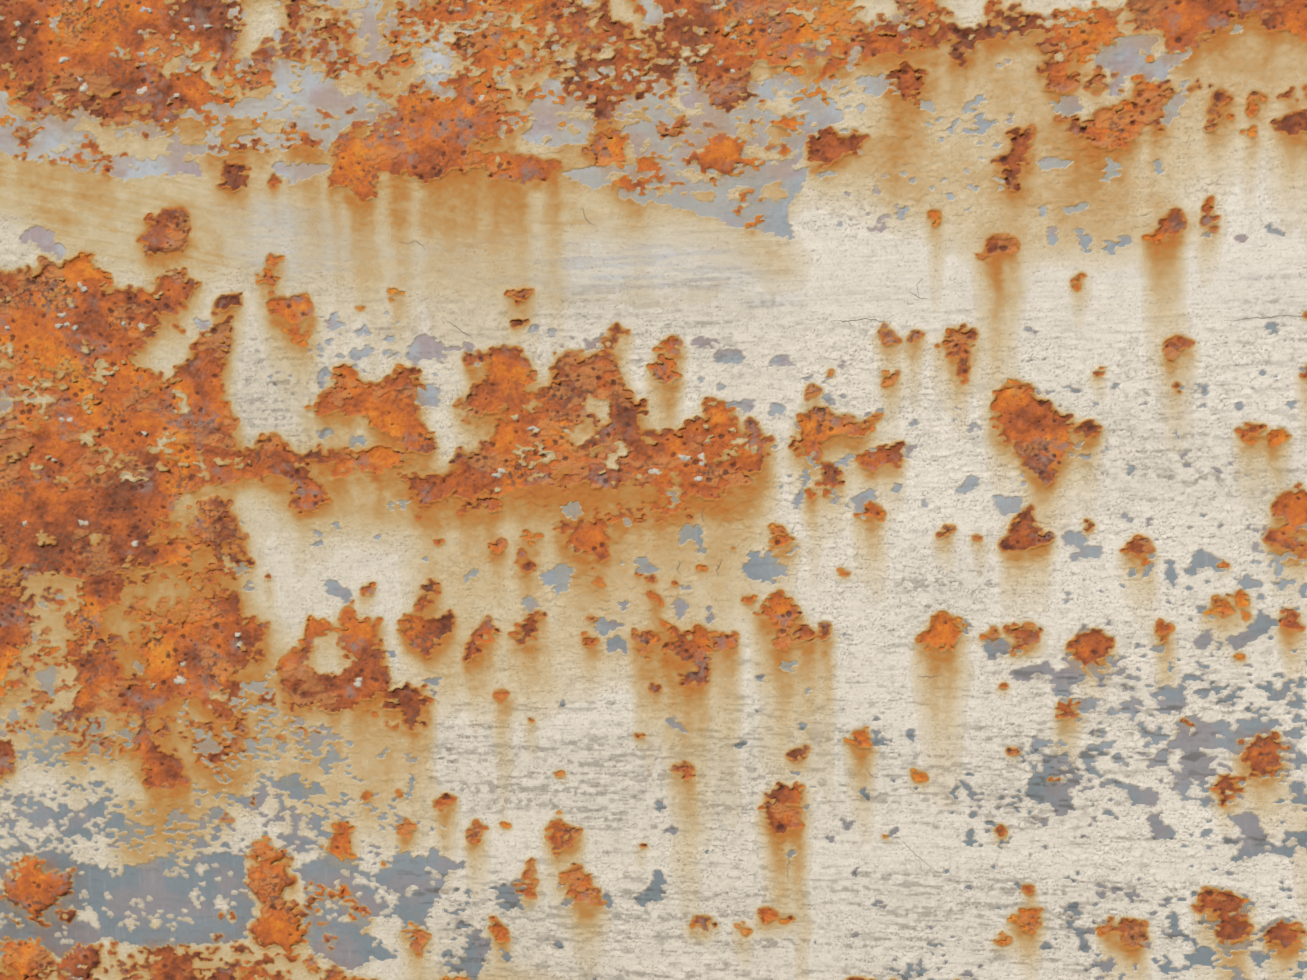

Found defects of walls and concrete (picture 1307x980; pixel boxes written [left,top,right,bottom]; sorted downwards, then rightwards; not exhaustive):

peeling [850,0,925,43]
peeling [0,0,494,185]
corrosion [0,0,1307,329]
corrosion [1161,333,1196,395]
corrosion [971,378,1103,570]
corrosion [1262,483,1307,568]
corrosion [0,195,907,980]
peeling [870,717,915,746]
peeling [0,665,526,980]
peeling [826,818,856,843]
peeling [889,926,955,980]
corrosion [1190,886,1307,978]